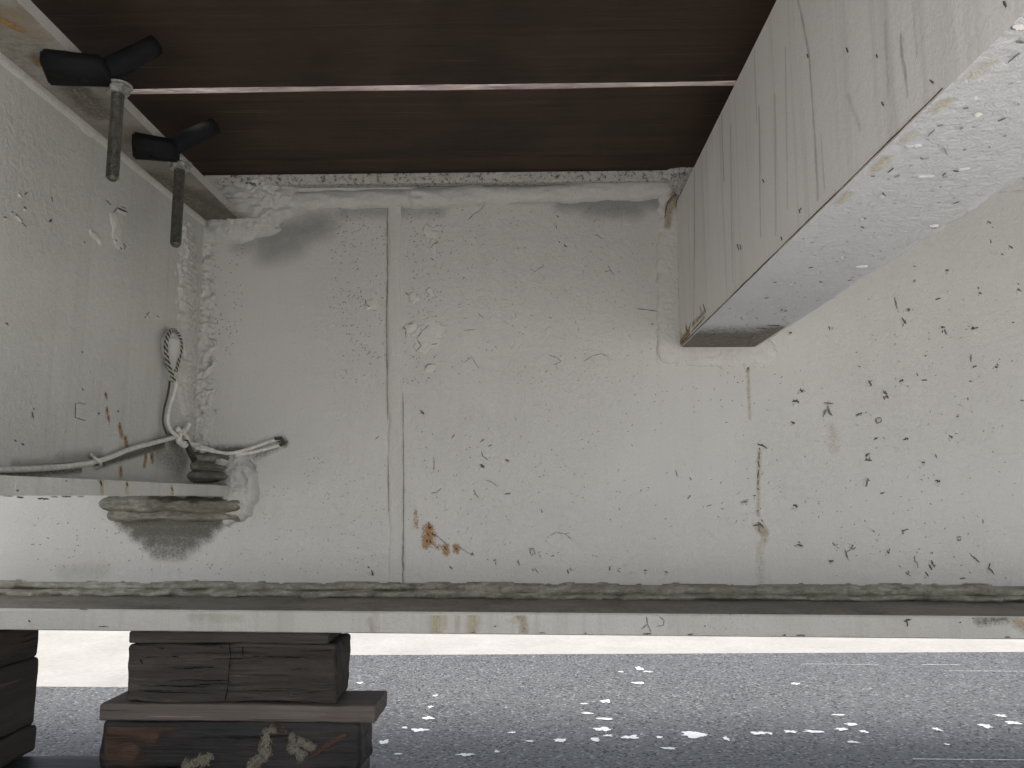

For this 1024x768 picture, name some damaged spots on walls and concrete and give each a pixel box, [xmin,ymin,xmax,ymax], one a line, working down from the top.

damp [120,519,223,557]
corrosion [414,510,460,556]